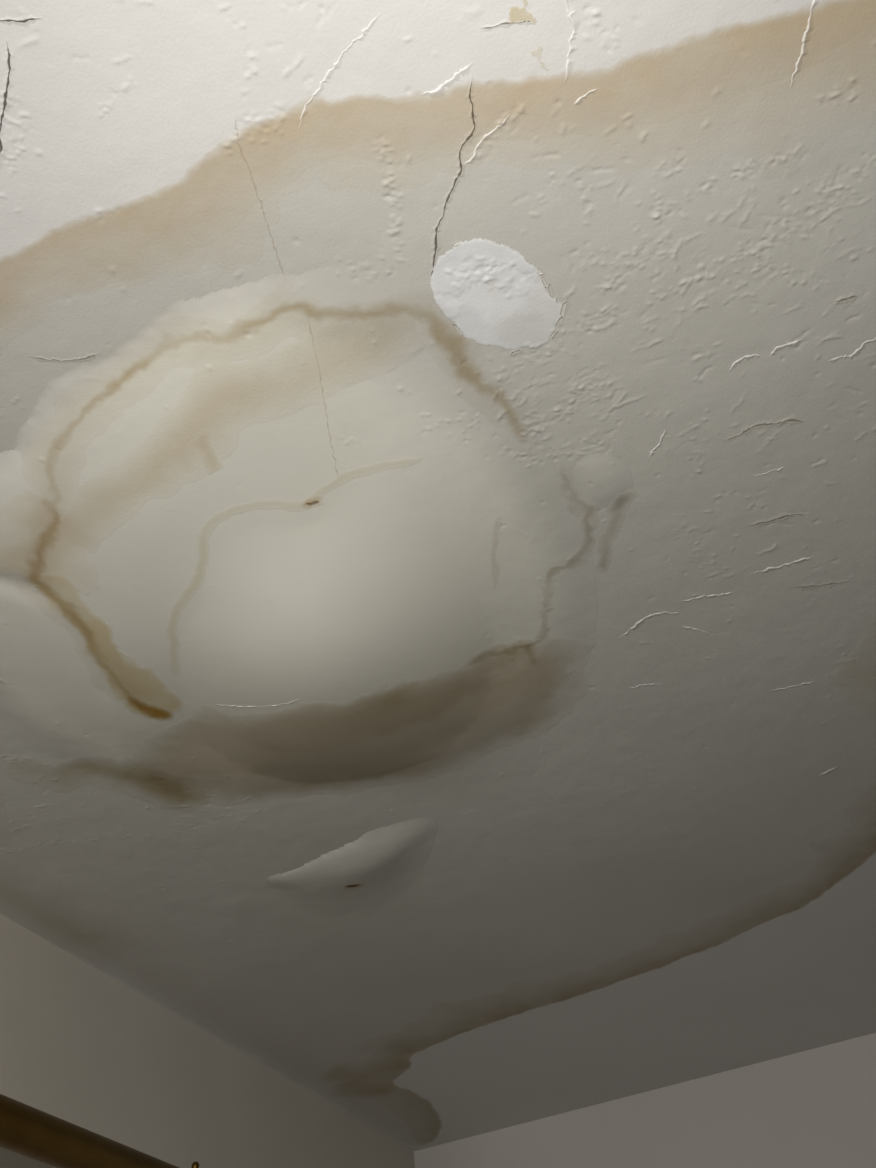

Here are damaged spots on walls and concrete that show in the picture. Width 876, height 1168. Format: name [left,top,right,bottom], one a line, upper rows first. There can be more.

crack [0,14,44,170]
crack [480,18,531,32]
leakage [462,0,876,180]
crack [790,0,820,89]
crack [420,62,511,279]
leakage [0,81,540,703]
peeling [430,238,567,355]
crack [728,339,803,372]
leakage [1,755,213,813]
leakage [131,635,596,806]
leakage [0,856,142,966]
leakage [353,783,876,1053]